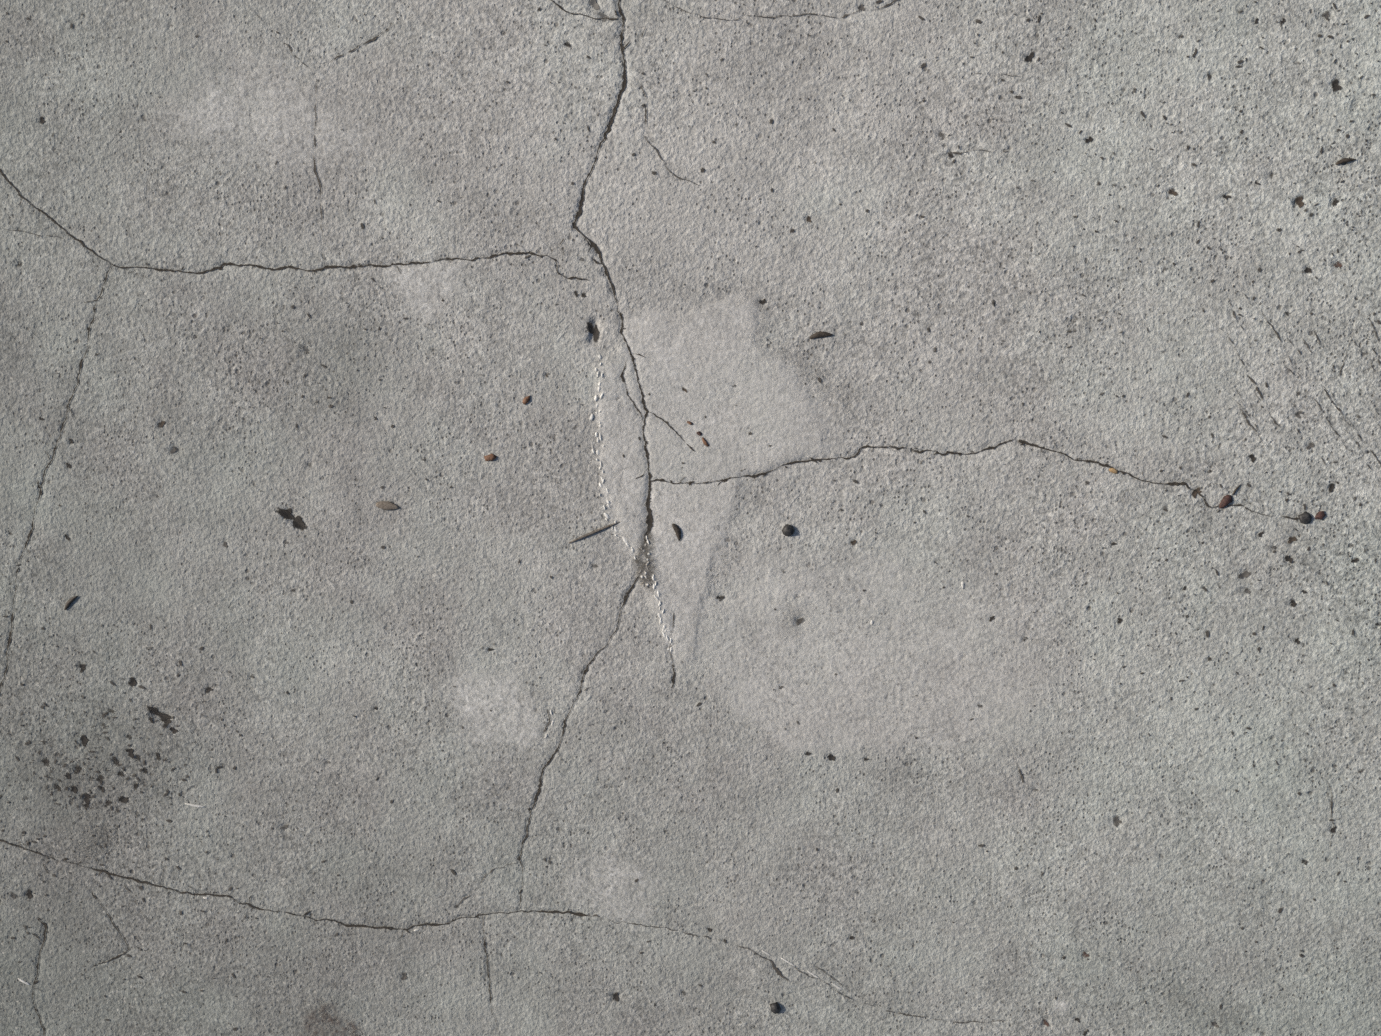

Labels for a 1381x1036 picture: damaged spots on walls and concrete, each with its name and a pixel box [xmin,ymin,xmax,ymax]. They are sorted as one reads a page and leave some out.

crack [0,79,588,689]
crack [270,0,1218,1022]
crack [32,918,48,1035]
crack [0,840,264,910]